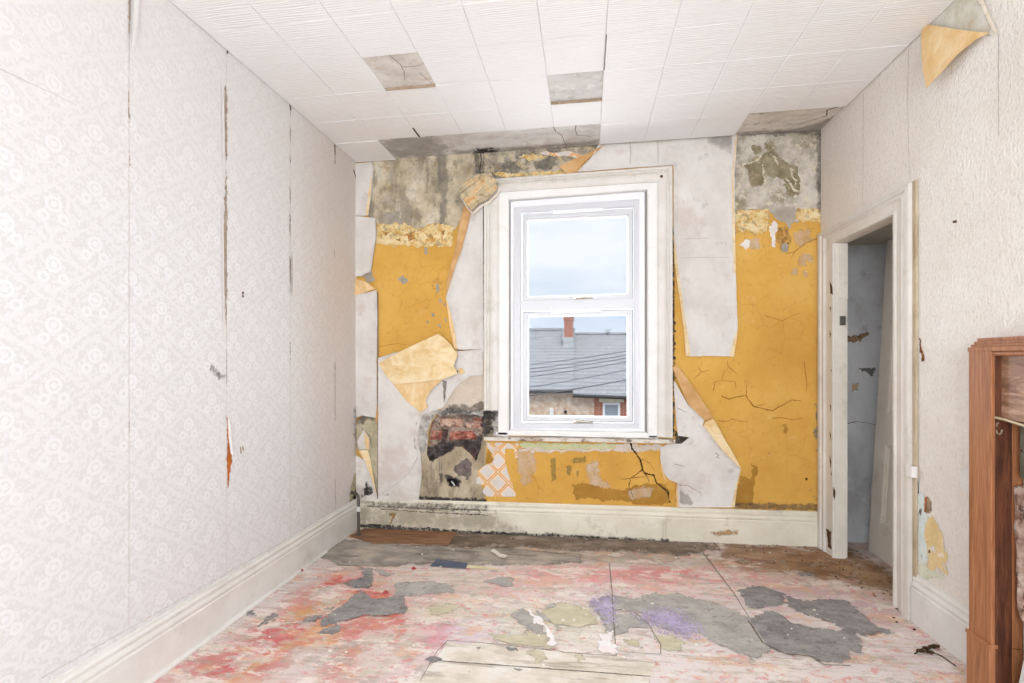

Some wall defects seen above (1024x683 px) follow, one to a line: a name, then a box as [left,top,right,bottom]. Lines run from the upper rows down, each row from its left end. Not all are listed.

peeling [363,52,436,91]
peeling [547,70,604,105]
peeling [921,0,997,88]
flaking render [734,106,844,277]
flaking render [847,332,869,343]
spalling [378,284,498,501]
crack [695,361,807,422]
flaking render [356,415,377,490]
peeling [572,461,677,505]
crack [627,443,670,503]
peeling [735,463,758,506]
flaking render [918,479,948,580]